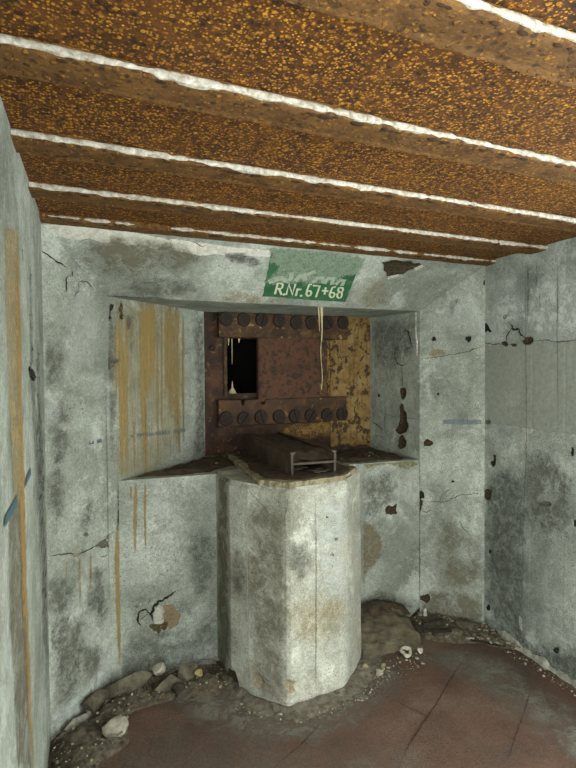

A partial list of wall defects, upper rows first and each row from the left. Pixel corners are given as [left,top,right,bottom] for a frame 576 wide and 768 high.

crack [42,251,169,300]
spalling [382,260,424,279]
rust [5,229,33,763]
damp [43,554,112,733]
rust [130,487,146,547]
rust [114,304,184,474]
crack [136,591,176,626]
peeling [149,604,181,634]
damp [168,478,242,668]
spalling [395,388,409,449]
crack [394,264,575,627]
damp [423,455,576,679]